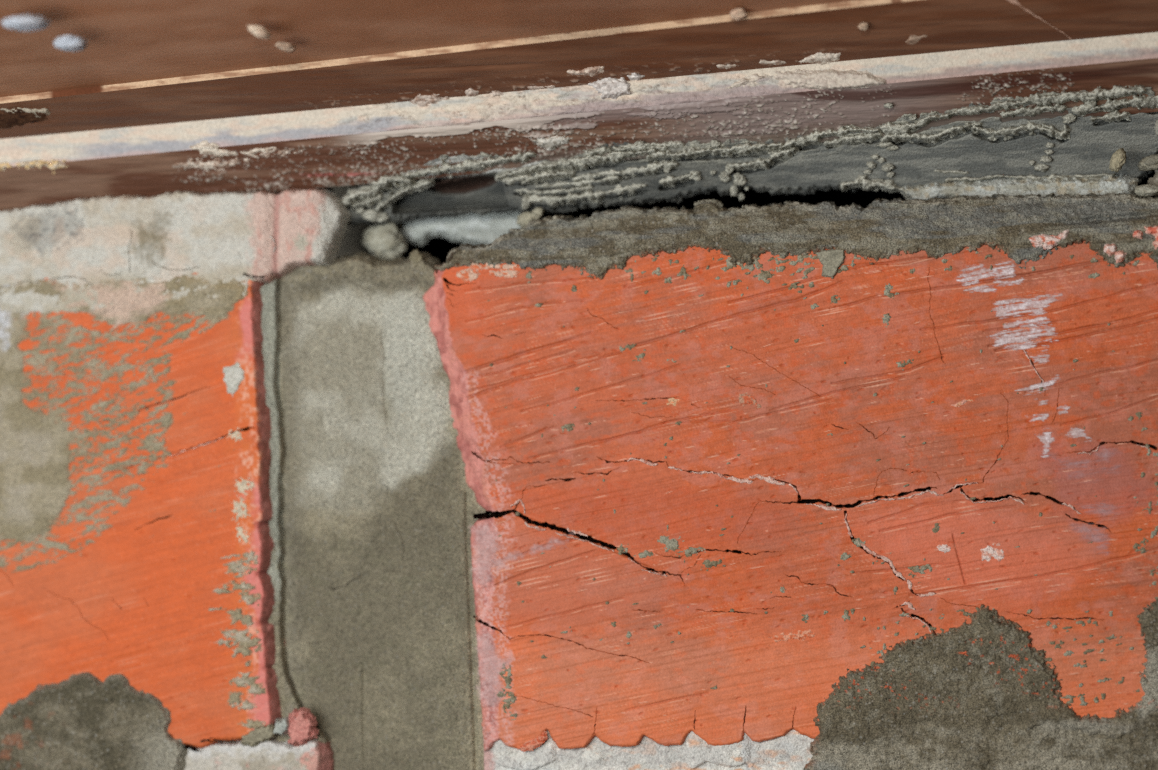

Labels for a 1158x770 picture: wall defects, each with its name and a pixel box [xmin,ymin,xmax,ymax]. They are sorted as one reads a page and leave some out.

crack [1048,441,1157,456]
peeling [231,477,254,544]
crack [471,393,1111,635]
crack [473,616,650,664]